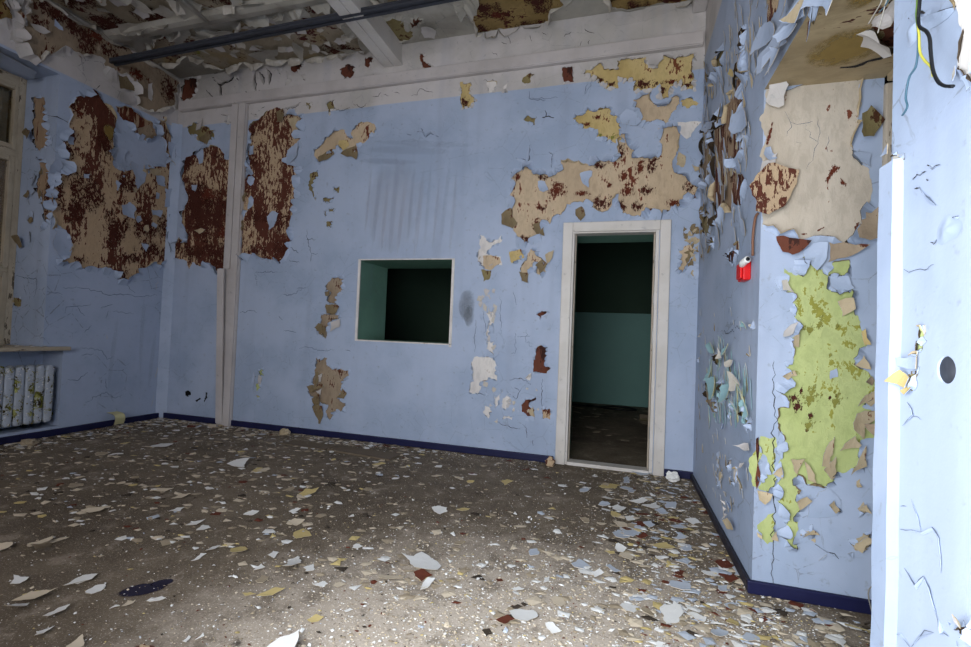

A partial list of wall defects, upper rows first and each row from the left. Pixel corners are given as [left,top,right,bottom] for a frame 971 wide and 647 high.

peeling [383,14,436,43]
peeling [0,0,377,286]
peeling [314,275,345,338]
peeling [306,356,352,424]
peeling [848,531,872,558]
crack [897,500,958,647]